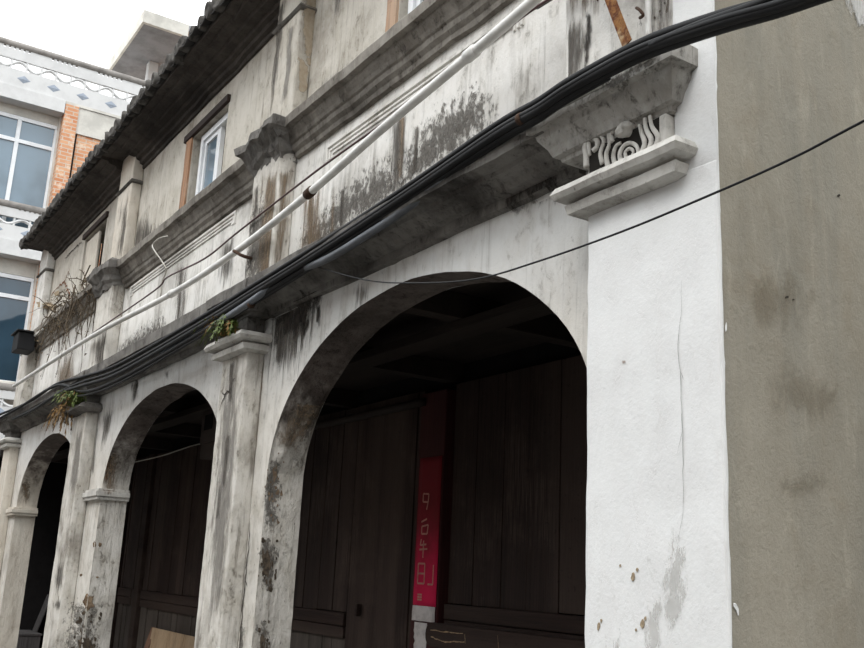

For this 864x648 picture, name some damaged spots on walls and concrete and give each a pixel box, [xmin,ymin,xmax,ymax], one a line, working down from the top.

damp [301,82,497,248]
damp [506,176,557,213]
damp [261,290,321,394]
crack [676,282,684,542]
peeling [264,453,284,526]
spalling [258,537,278,592]
spalling [71,594,102,648]
spalling [258,620,270,648]